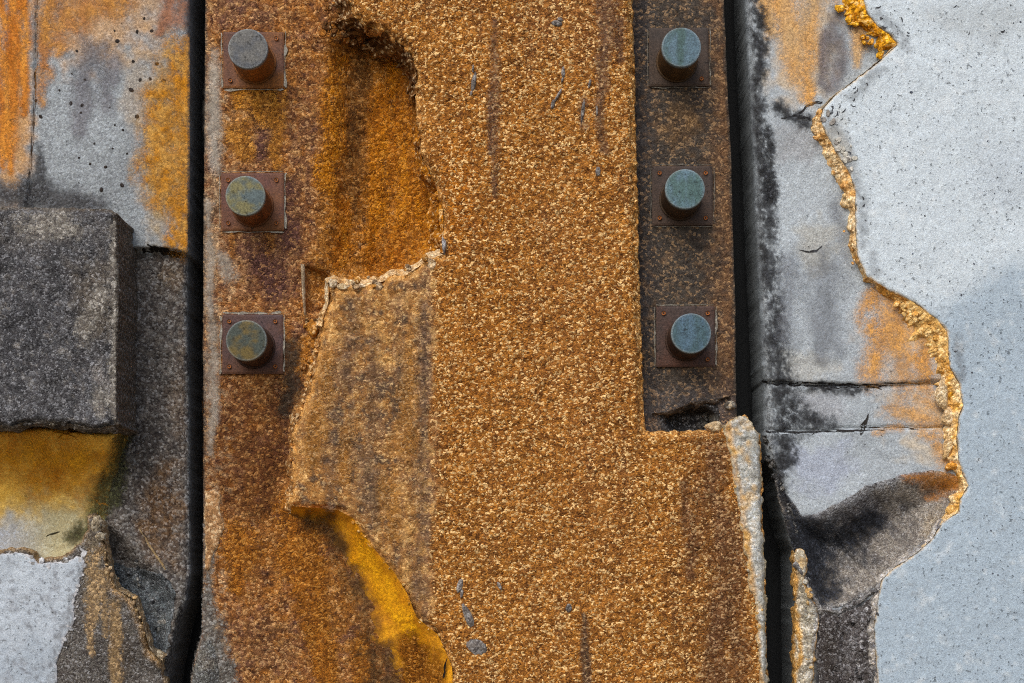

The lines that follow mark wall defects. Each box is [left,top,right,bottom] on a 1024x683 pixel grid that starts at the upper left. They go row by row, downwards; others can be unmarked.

rust [0,0,127,172]
rust [135,0,188,255]
rust [313,51,432,278]
spalling [0,421,176,683]
damp [65,433,131,544]
rust [218,498,338,683]
spalling [283,0,453,683]
rust [348,523,444,683]
spalling [652,0,968,683]
damp [748,0,886,683]
crack [762,380,935,390]
crack [766,414,940,435]